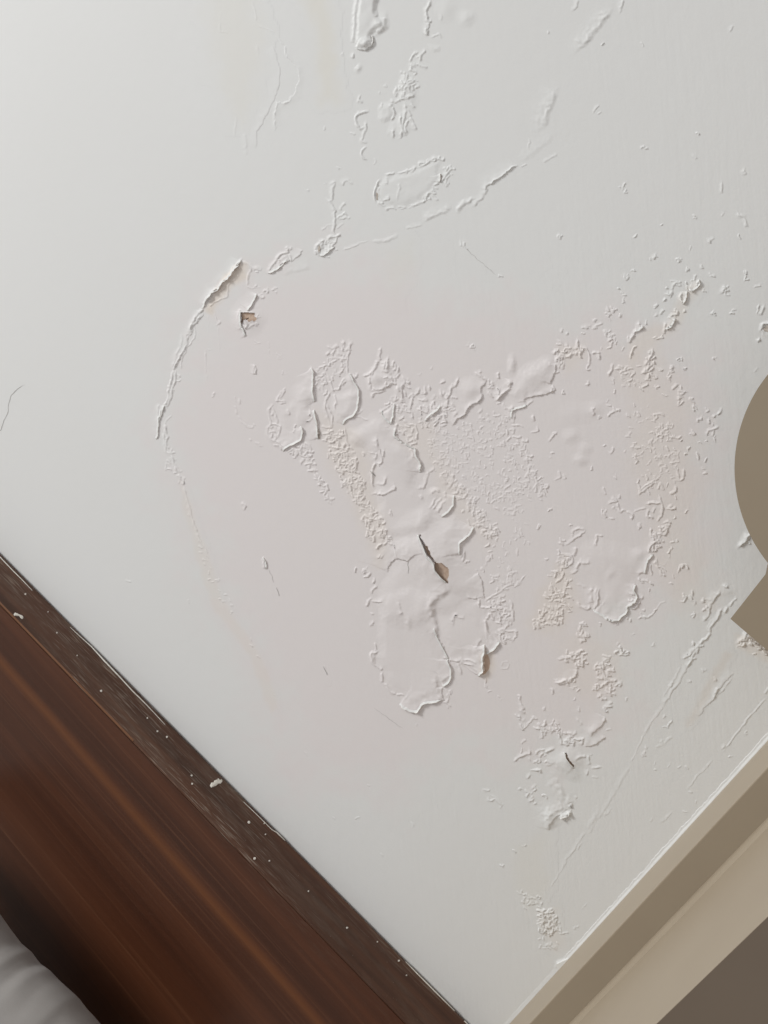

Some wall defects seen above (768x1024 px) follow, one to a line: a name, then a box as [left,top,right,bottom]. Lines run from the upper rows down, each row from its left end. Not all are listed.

peeling [372,154,456,212]
peeling [755,303,768,343]
peeling [233,257,737,714]
peeling [512,549,630,805]
peeling [516,889,580,969]